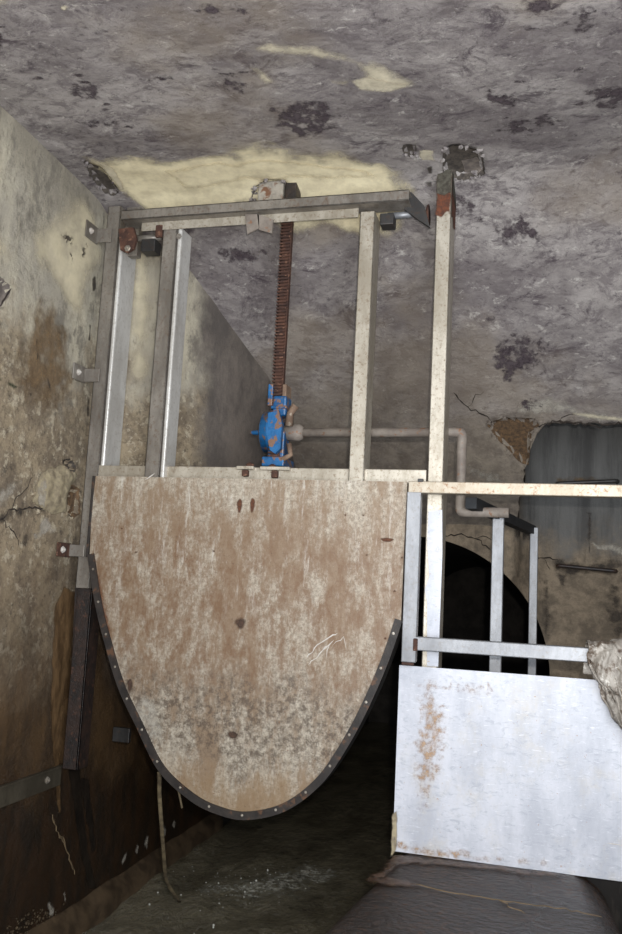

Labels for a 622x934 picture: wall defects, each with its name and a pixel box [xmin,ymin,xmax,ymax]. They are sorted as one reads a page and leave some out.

mould [270,101,335,137]
spalling [81,160,123,196]
spalling [440,144,485,184]
mould [496,215,538,241]
spalling [0,277,12,318]
leakage [25,310,72,404]
mould [494,334,542,382]
crack [454,393,489,418]
spalling [486,415,543,465]
crack [0,477,44,546]
corrosion [418,704,442,780]
crack [52,815,75,874]